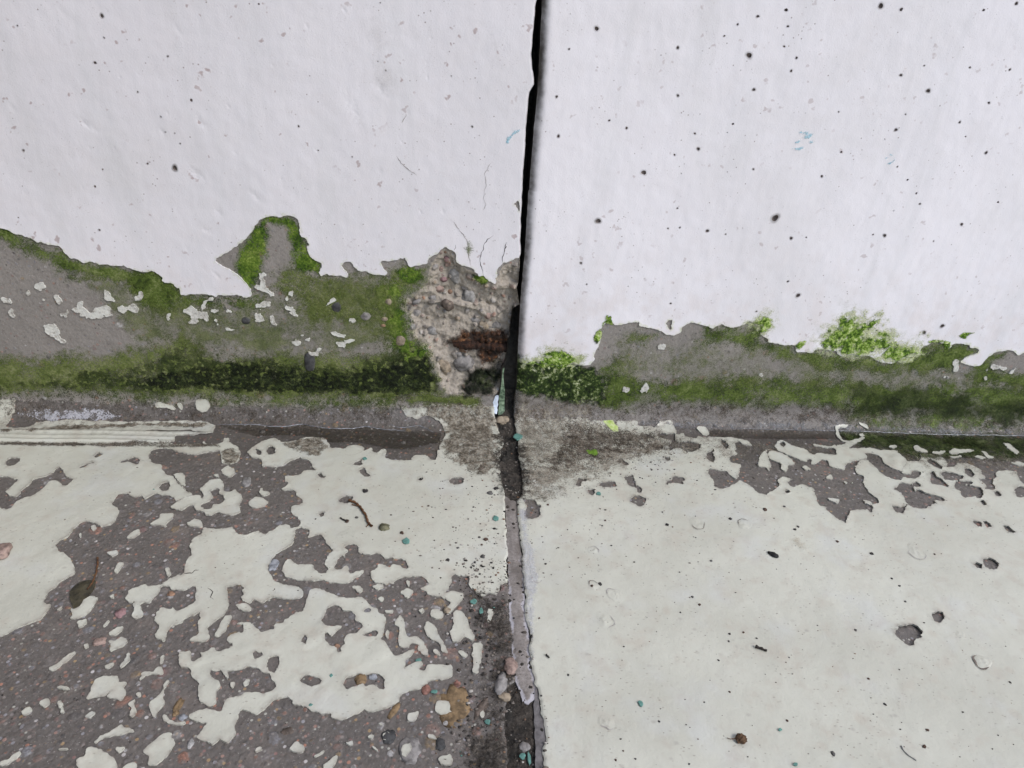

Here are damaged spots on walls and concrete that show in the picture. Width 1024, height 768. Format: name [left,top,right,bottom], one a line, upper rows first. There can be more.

peeling [0,215,531,768]
rust [446,329,509,365]
peeling [513,320,1024,523]